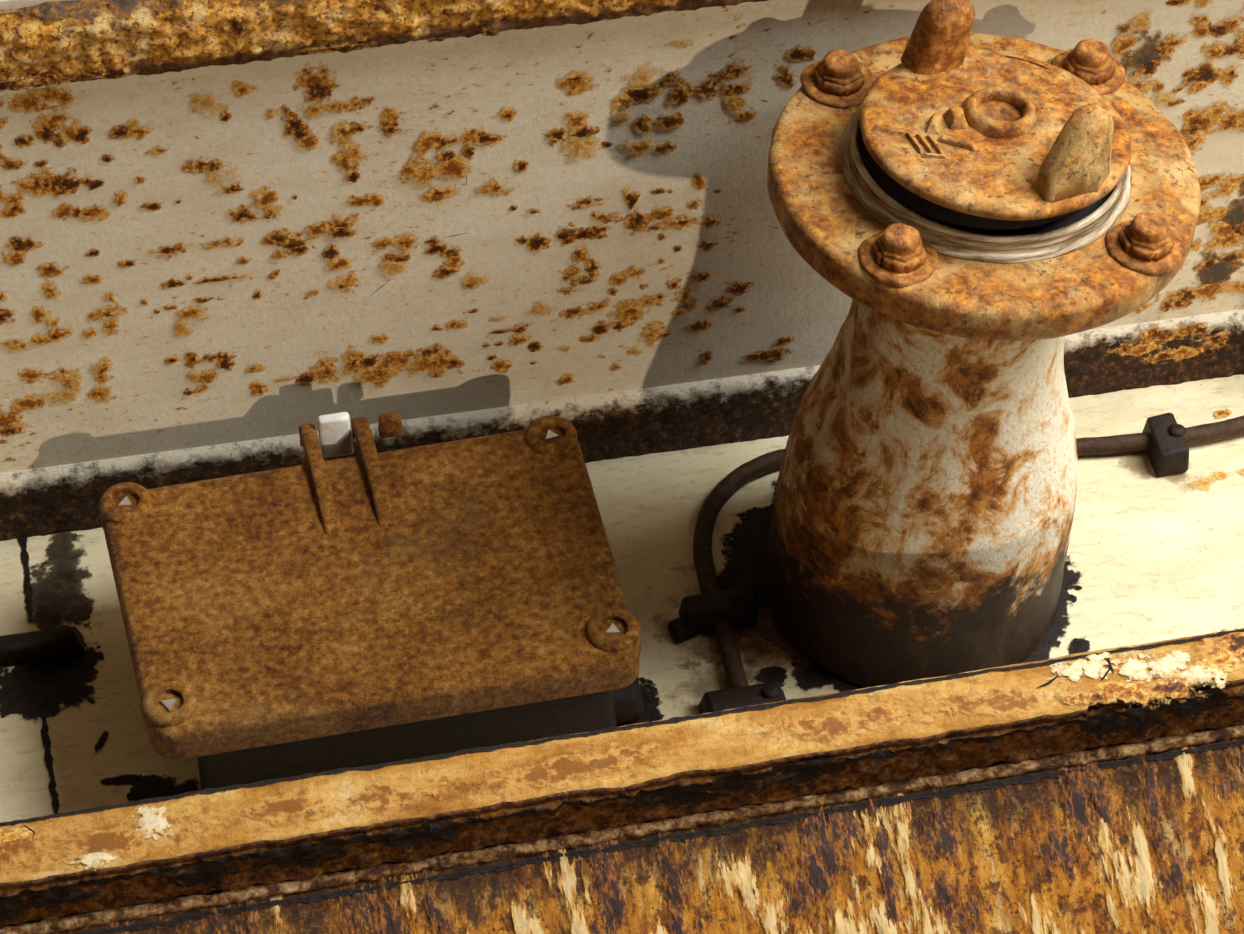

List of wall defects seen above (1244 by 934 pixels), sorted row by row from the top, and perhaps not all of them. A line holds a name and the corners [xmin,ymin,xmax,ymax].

rust [0,0,314,38]
rust [776,44,816,88]
rust [1111,0,1244,155]
rust [0,42,404,352]
rust [399,106,518,203]
rust [513,160,529,173]
rust [164,172,754,397]
rust [742,336,795,363]
damp [25,531,94,633]
peeling [1047,650,1190,684]
rust [75,627,1244,934]
rust [0,809,226,929]